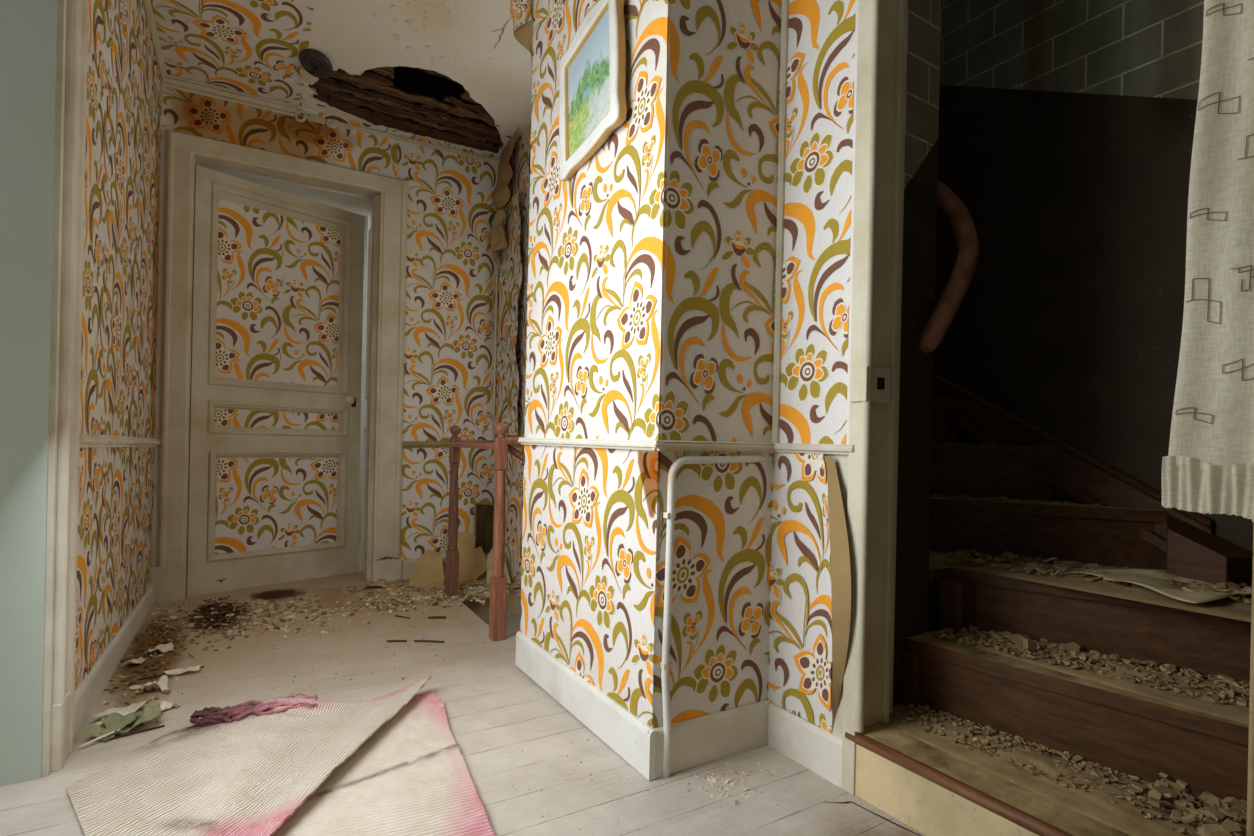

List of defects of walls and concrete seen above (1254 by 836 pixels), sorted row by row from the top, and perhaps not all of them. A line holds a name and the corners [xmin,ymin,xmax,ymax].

spalling [365,66,504,150]
flaking render [824,454,848,527]